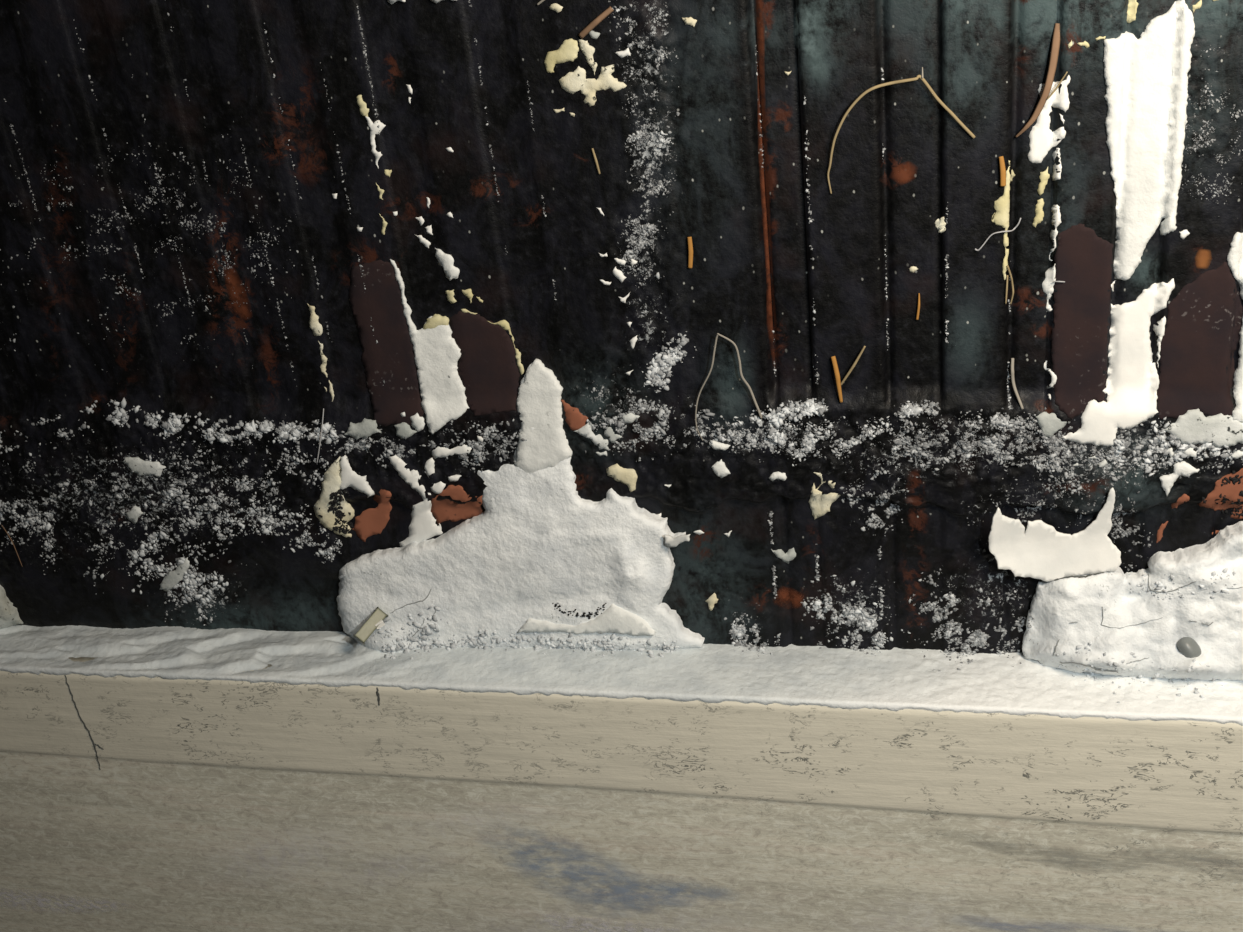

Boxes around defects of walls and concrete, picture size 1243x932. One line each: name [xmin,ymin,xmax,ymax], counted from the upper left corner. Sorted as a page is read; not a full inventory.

damp [8,124,298,347]
peeling [348,260,425,432]
damp [423,314,449,329]
peeling [449,289,520,416]
corrosion [756,0,774,330]
peeling [1032,198,1115,420]
peeling [1153,262,1243,420]
damp [586,331,1243,571]
damp [724,612,781,657]
damp [800,544,1038,672]
peeling [988,487,1121,582]
crack [65,675,104,770]